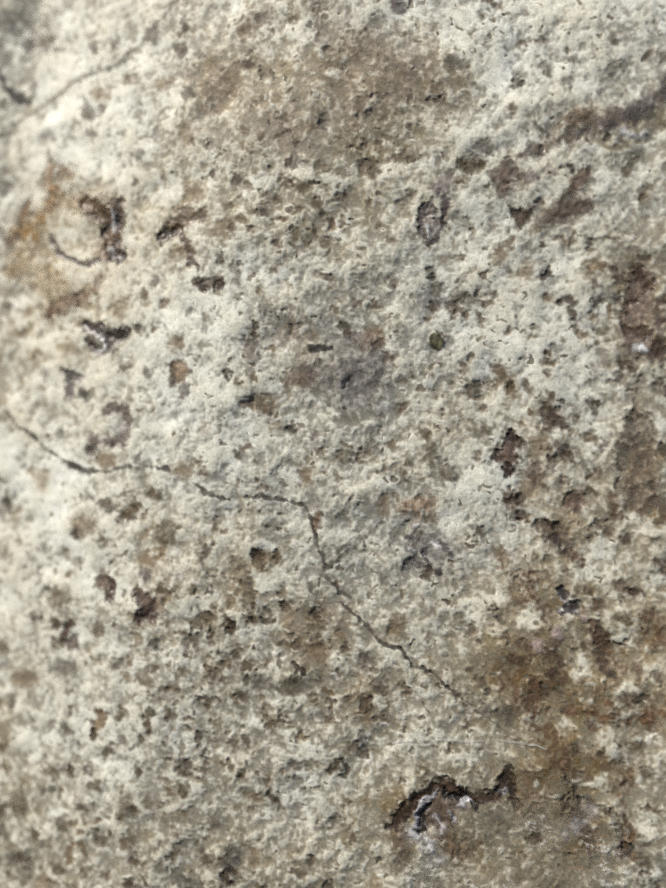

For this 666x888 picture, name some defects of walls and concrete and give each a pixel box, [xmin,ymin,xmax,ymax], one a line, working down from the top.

crack [6,412,170,473]
crack [195,484,454,693]
spalling [385,765,517,876]